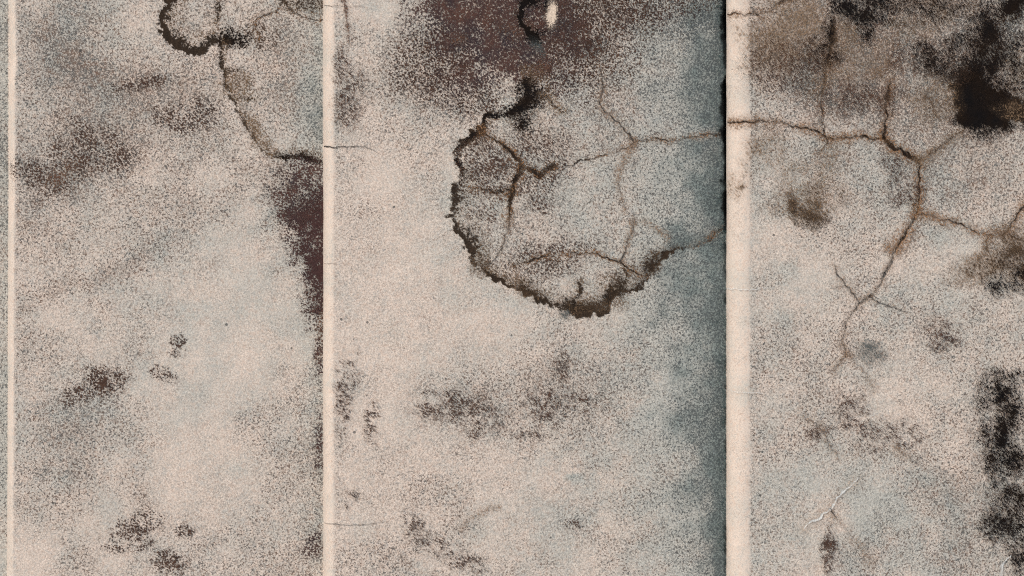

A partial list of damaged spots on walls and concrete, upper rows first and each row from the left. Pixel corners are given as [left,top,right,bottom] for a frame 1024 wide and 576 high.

crack [218,39,374,165]
crack [253,0,345,40]
leakage [445,0,684,319]
crack [468,19,1024,386]
leakage [715,0,1024,576]